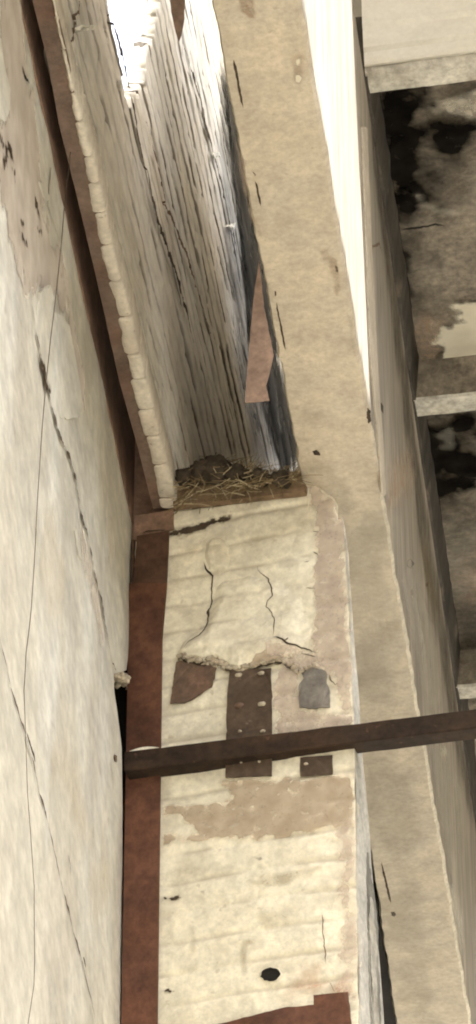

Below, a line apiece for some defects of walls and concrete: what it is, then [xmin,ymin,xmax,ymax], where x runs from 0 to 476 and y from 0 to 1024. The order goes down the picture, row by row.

crack [29,282,117,672]
peeling [176,486,352,733]
crack [257,566,342,685]
crack [0,641,96,1021]